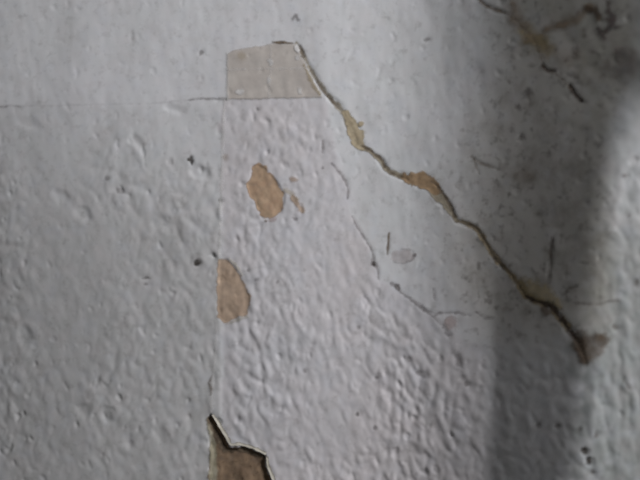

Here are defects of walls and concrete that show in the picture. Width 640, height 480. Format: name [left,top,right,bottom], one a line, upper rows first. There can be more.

crack [479,0,505,14]
crack [569,84,583,103]
peeling [246,163,304,221]
crack [294,42,578,341]
peeling [217,259,251,323]
flaking render [208,416,270,480]